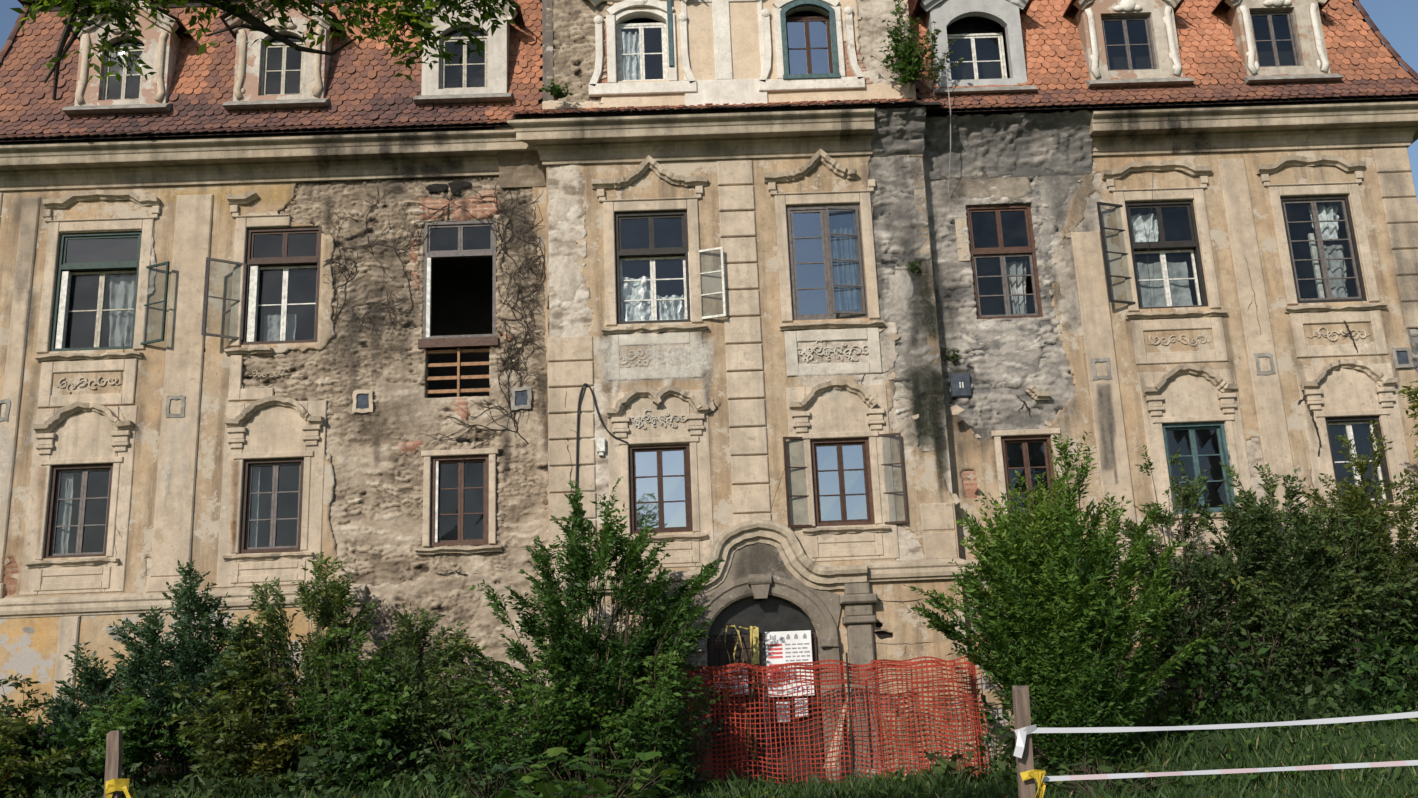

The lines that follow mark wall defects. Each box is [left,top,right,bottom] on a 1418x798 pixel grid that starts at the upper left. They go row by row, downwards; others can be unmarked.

flaking render [410,180,504,290]
peeling [548,164,594,338]
water stain [898,212,943,345]
peeling [1049,163,1111,337]
flaking render [454,398,471,442]
water stain [912,362,948,468]
flaking render [2,557,19,597]